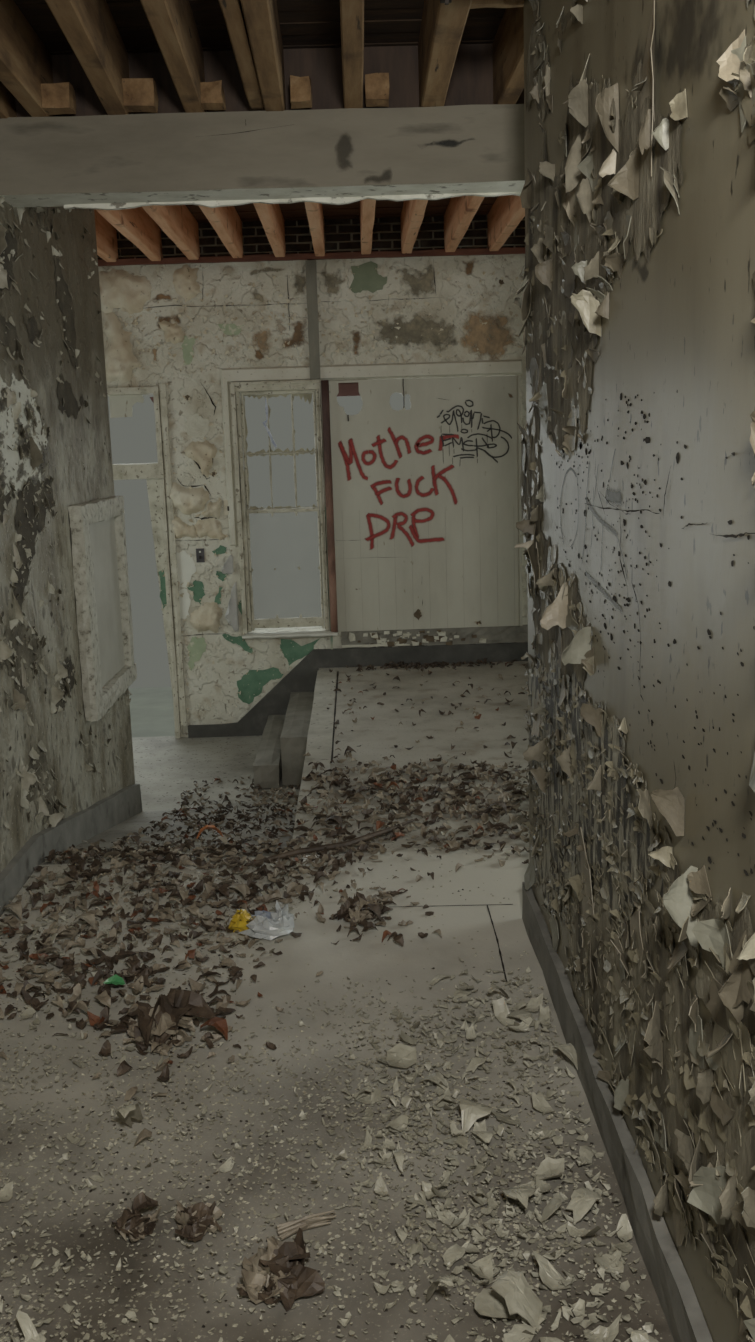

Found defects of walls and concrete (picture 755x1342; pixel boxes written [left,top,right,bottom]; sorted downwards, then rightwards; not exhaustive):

peeling [0,197,132,829]
flaking render [162,550,197,621]
peeling [298,0,755,1342]